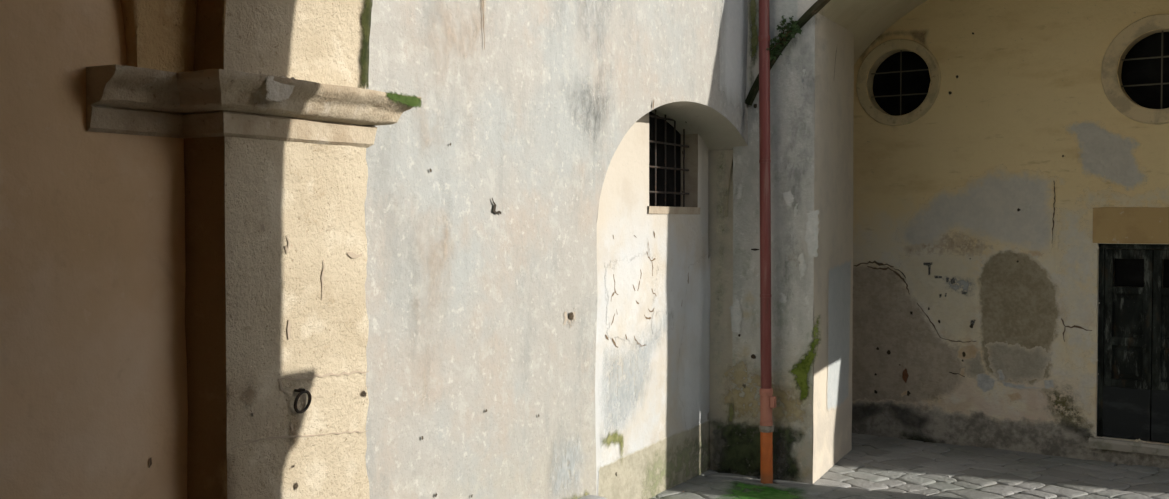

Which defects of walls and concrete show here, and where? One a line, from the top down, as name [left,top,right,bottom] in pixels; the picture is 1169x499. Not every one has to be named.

water stain [651,253,723,430]
peeling [783,190,820,281]
spalling [827,185,1169,415]
water stain [852,397,1169,469]